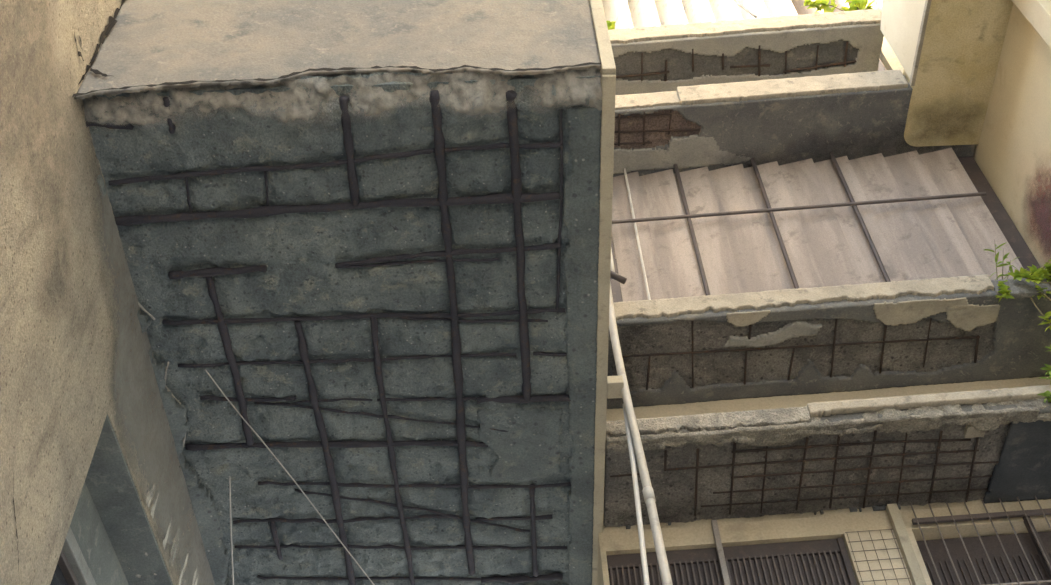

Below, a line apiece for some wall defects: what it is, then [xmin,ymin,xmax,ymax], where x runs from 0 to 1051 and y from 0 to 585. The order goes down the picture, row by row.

spalling [614,40,859,81]
spalling [614,107,702,150]
spalling [83,67,602,585]
spalling [613,297,1000,391]
spalling [594,398,1051,527]